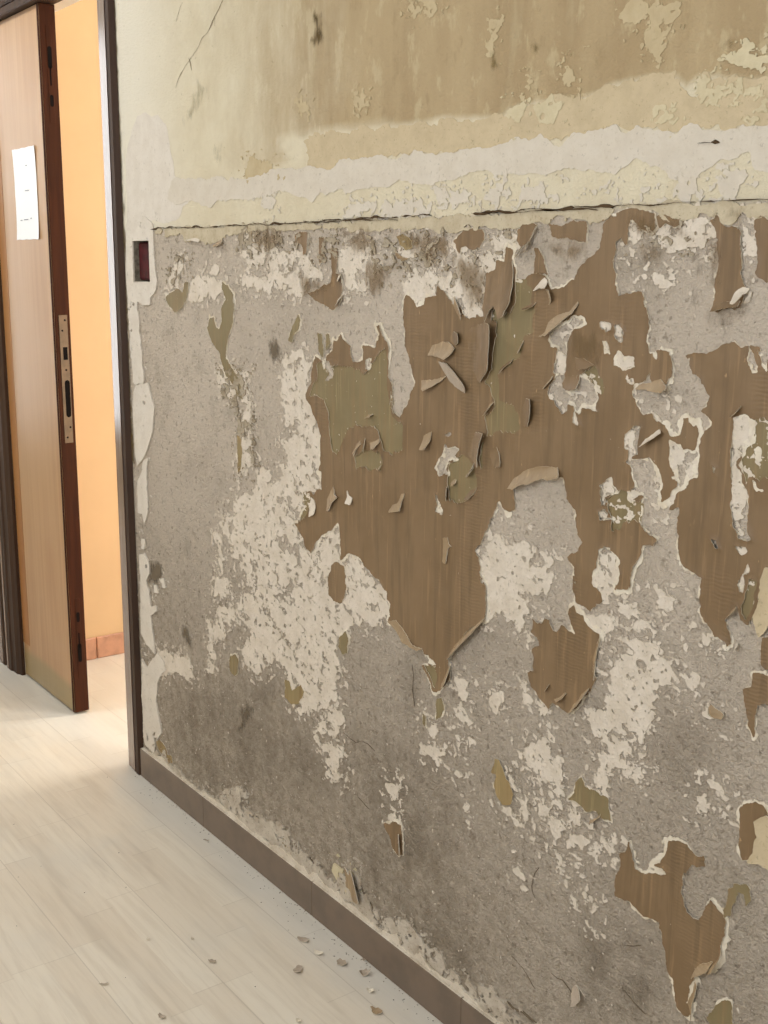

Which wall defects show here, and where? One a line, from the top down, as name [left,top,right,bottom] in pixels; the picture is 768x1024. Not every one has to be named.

crack [176,0,223,85]
peeling [484,5,505,65]
peeling [615,0,682,69]
peeling [717,38,768,74]
crack [151,214,430,230]
crack [473,199,768,215]
peeling [126,65,768,1024]